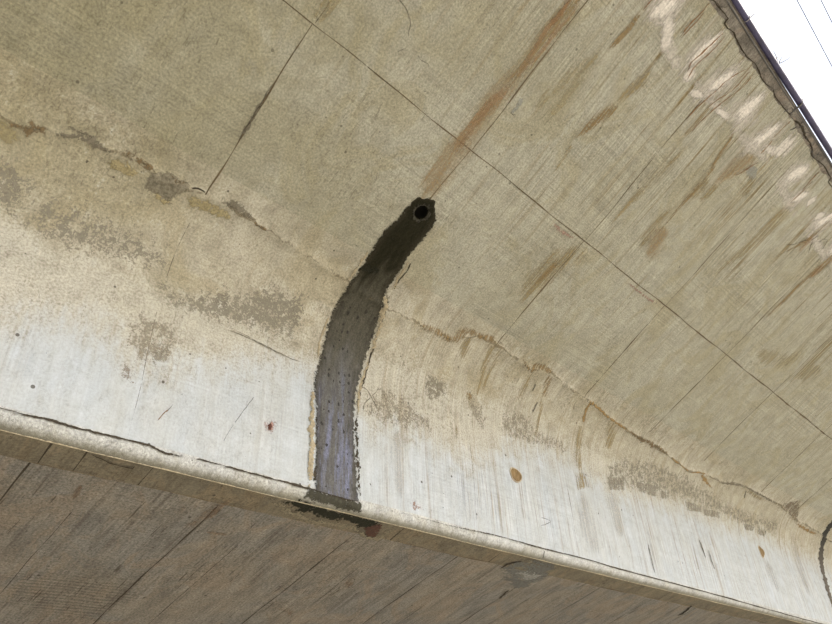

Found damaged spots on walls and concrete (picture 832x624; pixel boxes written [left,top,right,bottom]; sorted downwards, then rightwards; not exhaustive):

corrosion [610,0,652,48]
corrosion [423,0,580,198]
corrosion [578,72,650,136]
damp [645,0,796,163]
corrosion [689,70,754,131]
corrosion [641,121,790,255]
damp [776,163,816,215]
damp [806,212,832,260]
crack [1,408,357,502]
crack [427,519,822,624]